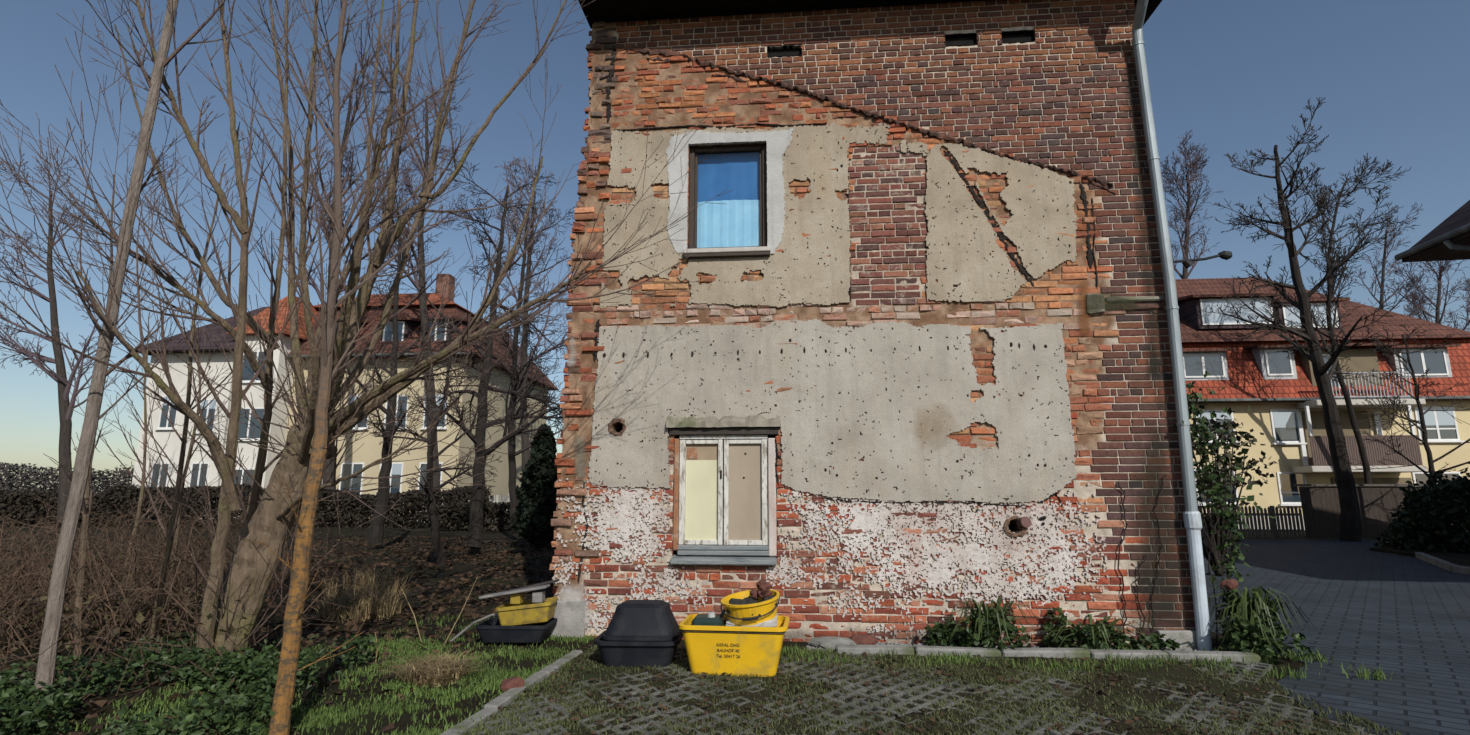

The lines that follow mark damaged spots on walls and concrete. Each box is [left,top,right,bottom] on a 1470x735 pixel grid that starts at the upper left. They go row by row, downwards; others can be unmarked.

flaking render [652,184,669,200]
crack [926,150,1033,286]
flaking render [958,168,1010,226]
flaking render [594,259,1126,642]
damp [562,587,586,623]